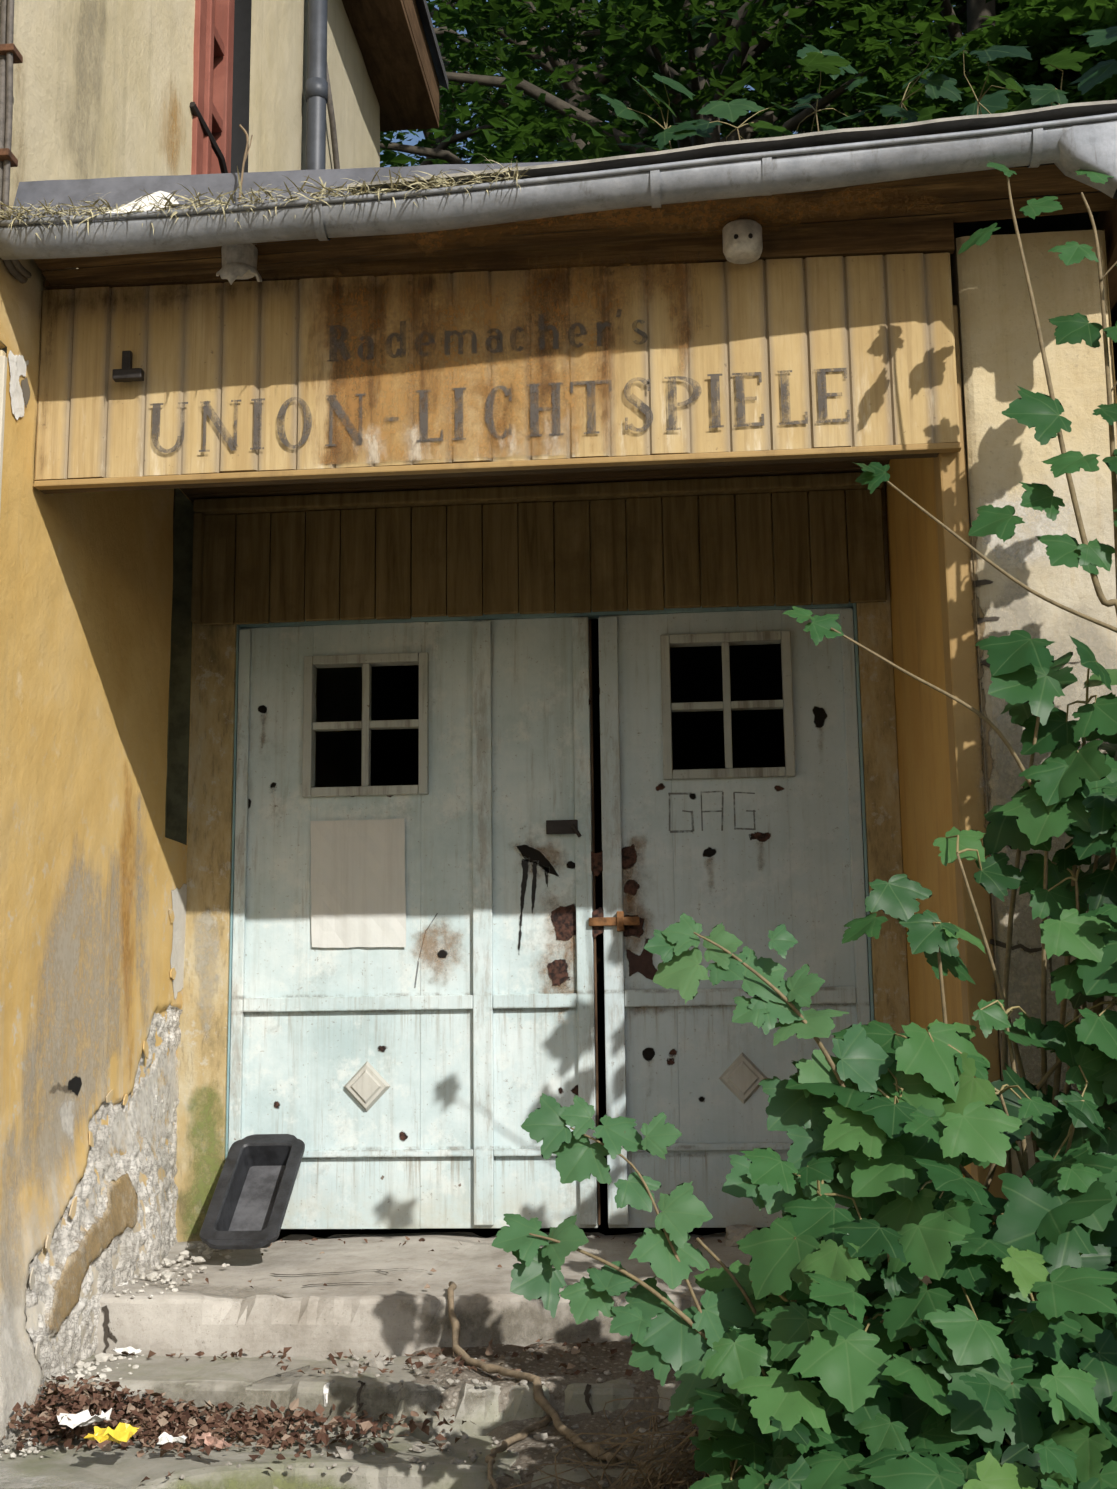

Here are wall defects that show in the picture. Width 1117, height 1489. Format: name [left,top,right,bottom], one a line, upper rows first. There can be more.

rust [543,904,604,993]
rust [591,851,603,877]
rust [622,841,647,950]
damp [0,862,120,1444]
peeling [24,883,283,1436]